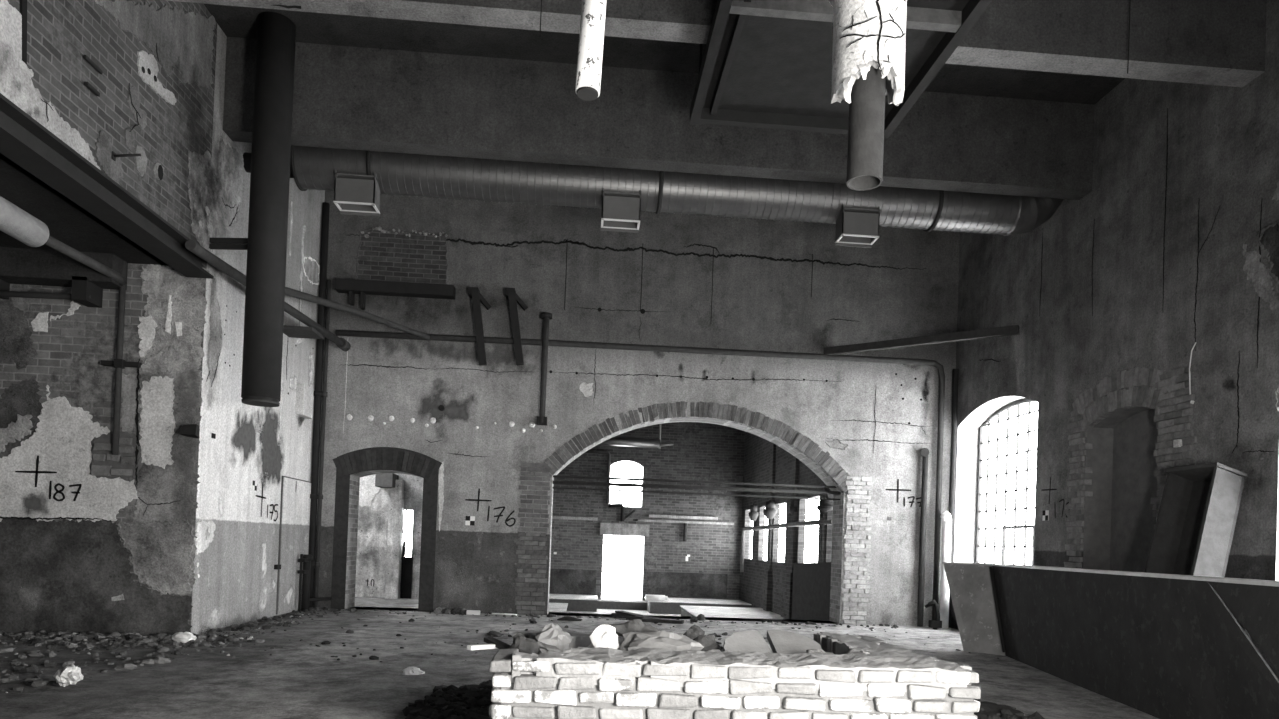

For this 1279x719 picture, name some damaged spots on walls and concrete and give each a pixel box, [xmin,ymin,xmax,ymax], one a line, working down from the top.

crack [446,238,927,270]
flaking render [1258,220,1279,296]
flaking render [0,300,42,458]
damp [232,407,283,486]
damp [419,382,474,436]